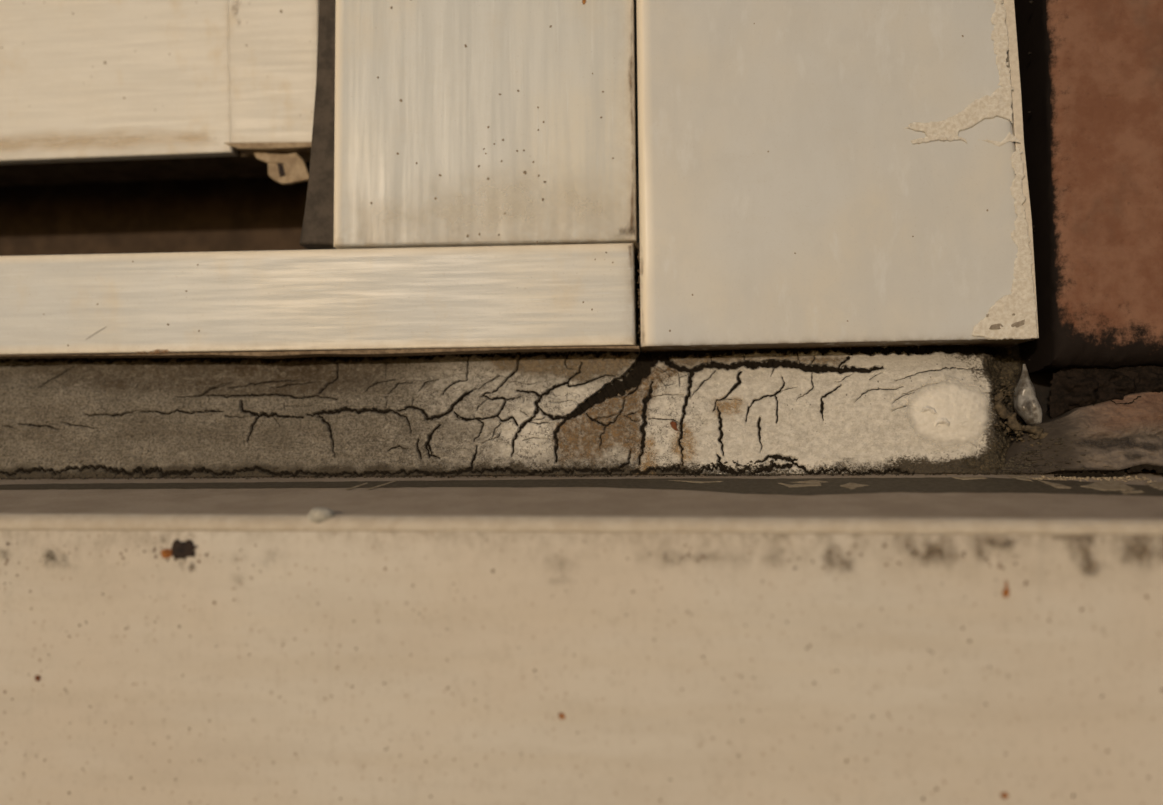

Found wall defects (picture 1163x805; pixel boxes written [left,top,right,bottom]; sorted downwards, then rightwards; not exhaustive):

peeling [904,86,1038,340]
crack [0,345,1008,477]